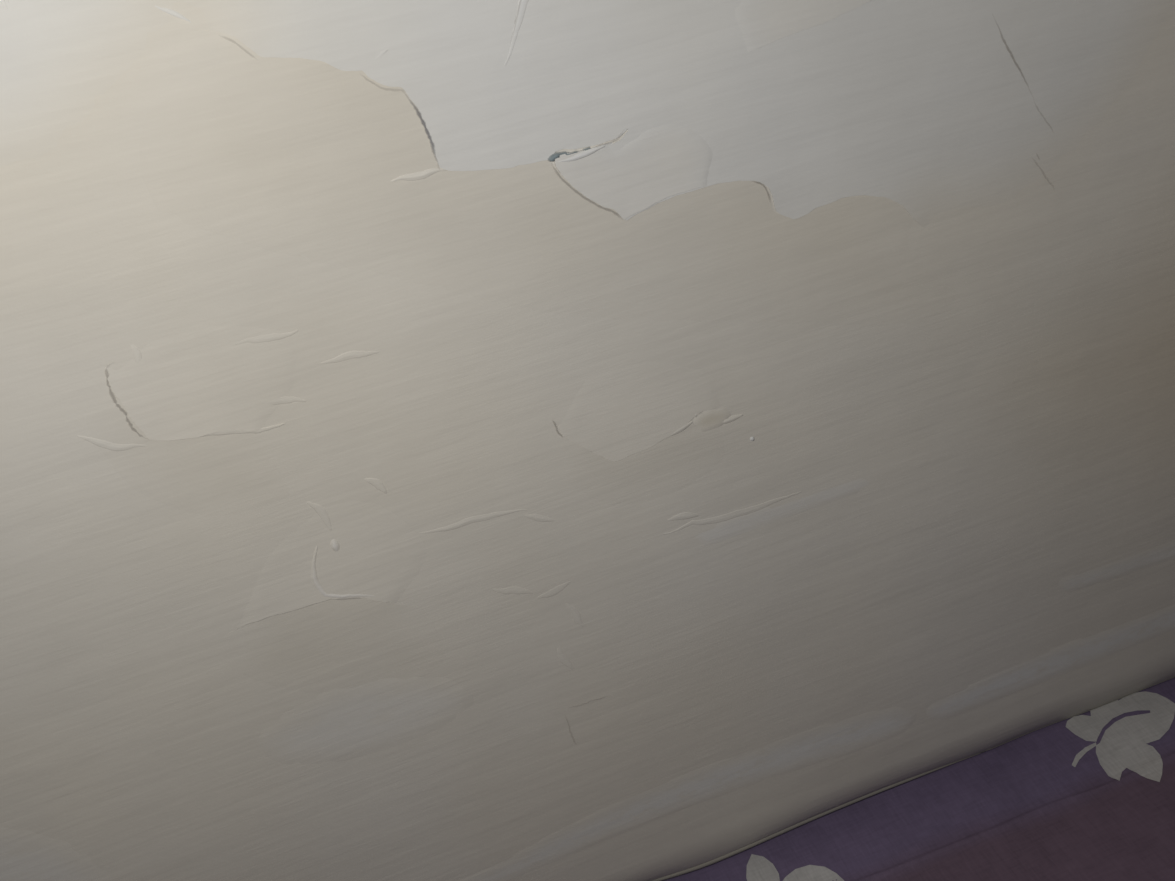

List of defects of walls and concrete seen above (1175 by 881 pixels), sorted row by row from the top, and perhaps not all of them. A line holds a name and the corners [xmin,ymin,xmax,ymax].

peeling [0,0,1175,326]